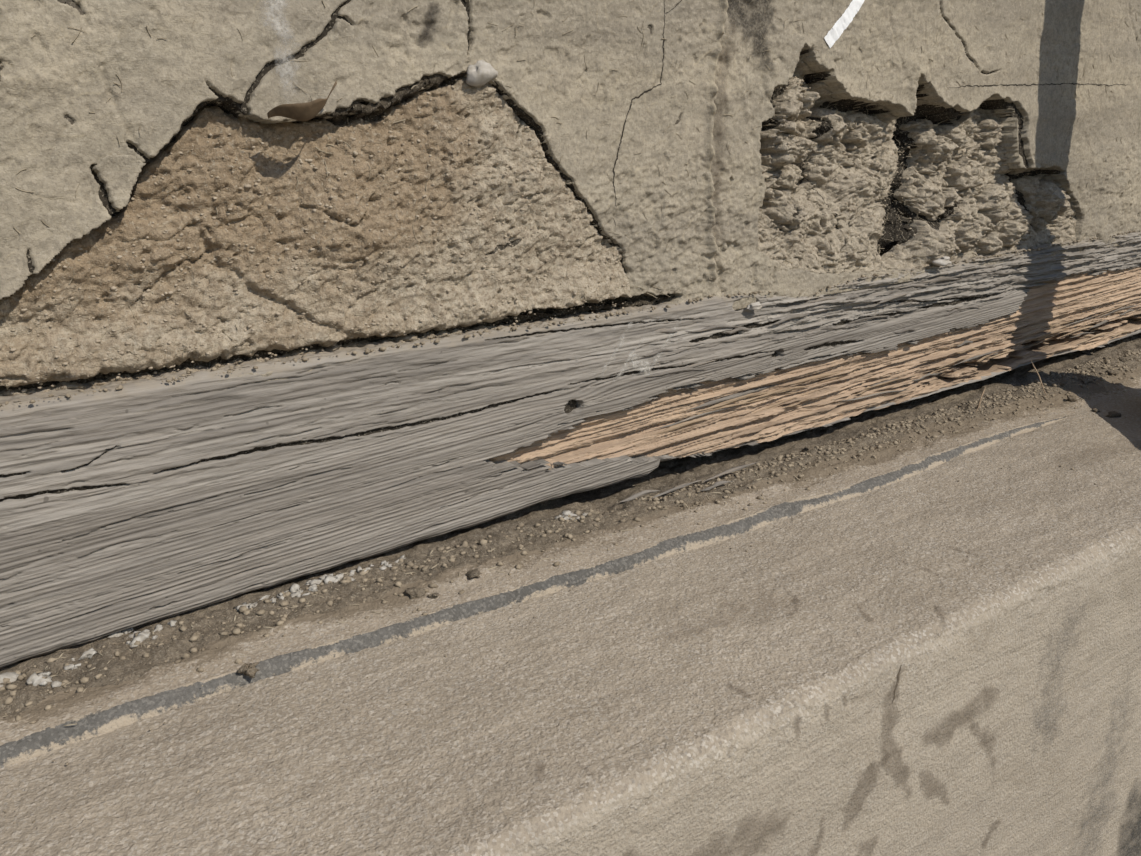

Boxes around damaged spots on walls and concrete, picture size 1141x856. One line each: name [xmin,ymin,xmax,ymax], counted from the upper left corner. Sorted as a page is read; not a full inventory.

crack [90,0,352,216]
spalling [0,60,675,396]
crack [460,0,470,50]
crack [492,0,682,273]
leakage [727,0,773,65]
spalling [756,55,1076,275]
crack [761,8,1126,248]